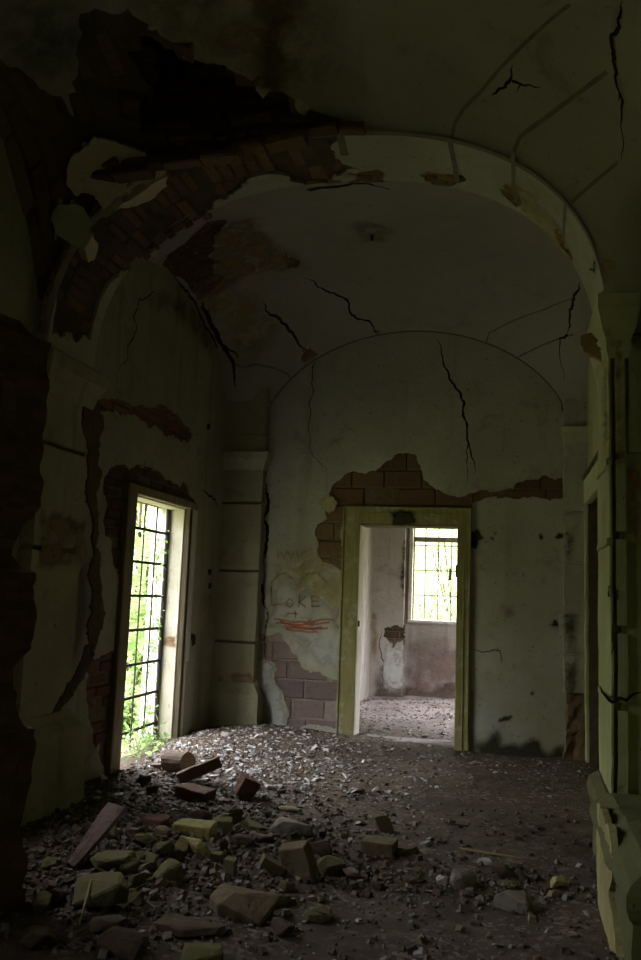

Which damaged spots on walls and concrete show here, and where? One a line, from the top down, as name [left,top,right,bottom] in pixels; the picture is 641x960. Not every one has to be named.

crack [491,65,541,95]
crack [609,1,624,161]
flaking render [157,196,227,299]
crack [170,270,238,388]
crack [306,278,380,335]
crack [436,339,476,486]
flaking render [315,453,563,570]
spalling [81,396,198,765]
flaking render [258,632,337,729]
flaking render [383,623,407,649]
crack [600,686,641,704]